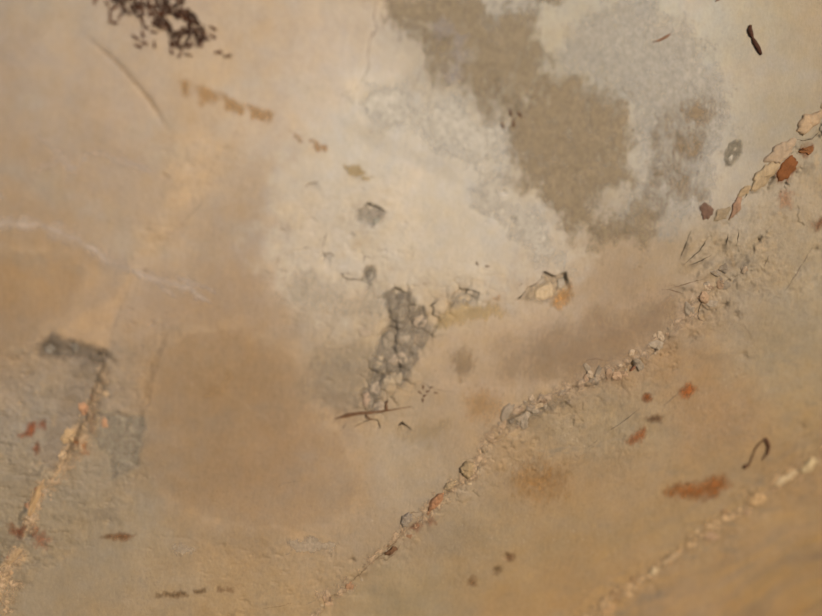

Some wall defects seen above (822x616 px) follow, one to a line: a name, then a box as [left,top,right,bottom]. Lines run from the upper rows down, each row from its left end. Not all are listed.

damp [364,0,726,267]
crack [337,256,479,336]
spalling [526,276,568,301]
spalling [43,335,102,361]
crack [456,231,739,486]
rust [670,477,724,498]